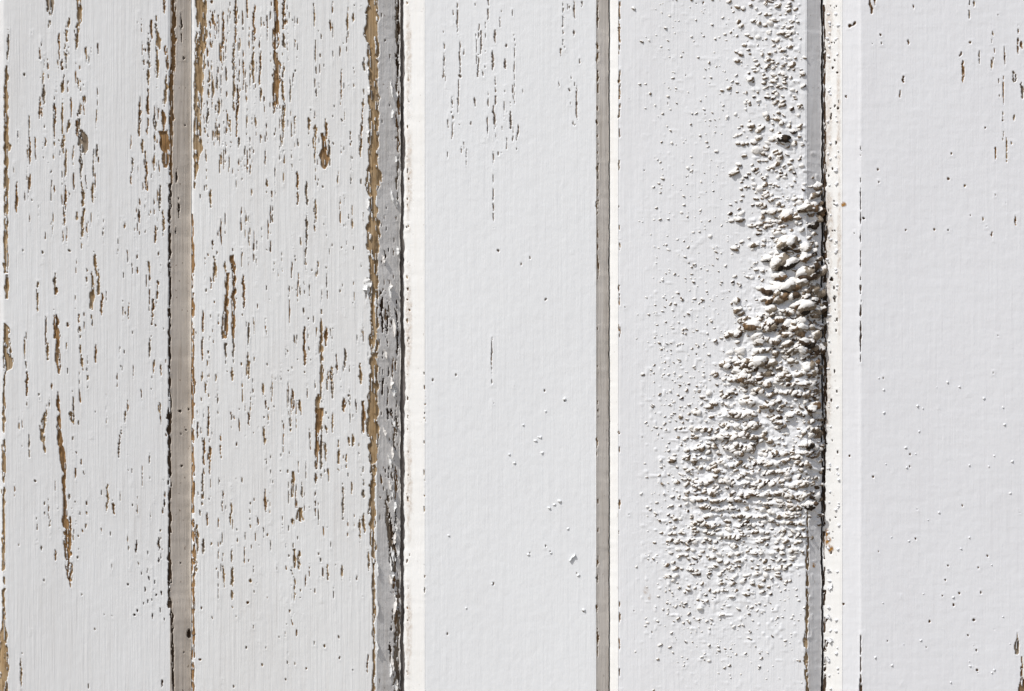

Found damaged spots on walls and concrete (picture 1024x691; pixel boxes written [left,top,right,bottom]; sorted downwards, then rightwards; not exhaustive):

peeling [0,0,107,691]
peeling [101,456,166,517]
peeling [127,530,165,621]
peeling [117,0,177,375]
peeling [191,0,411,691]